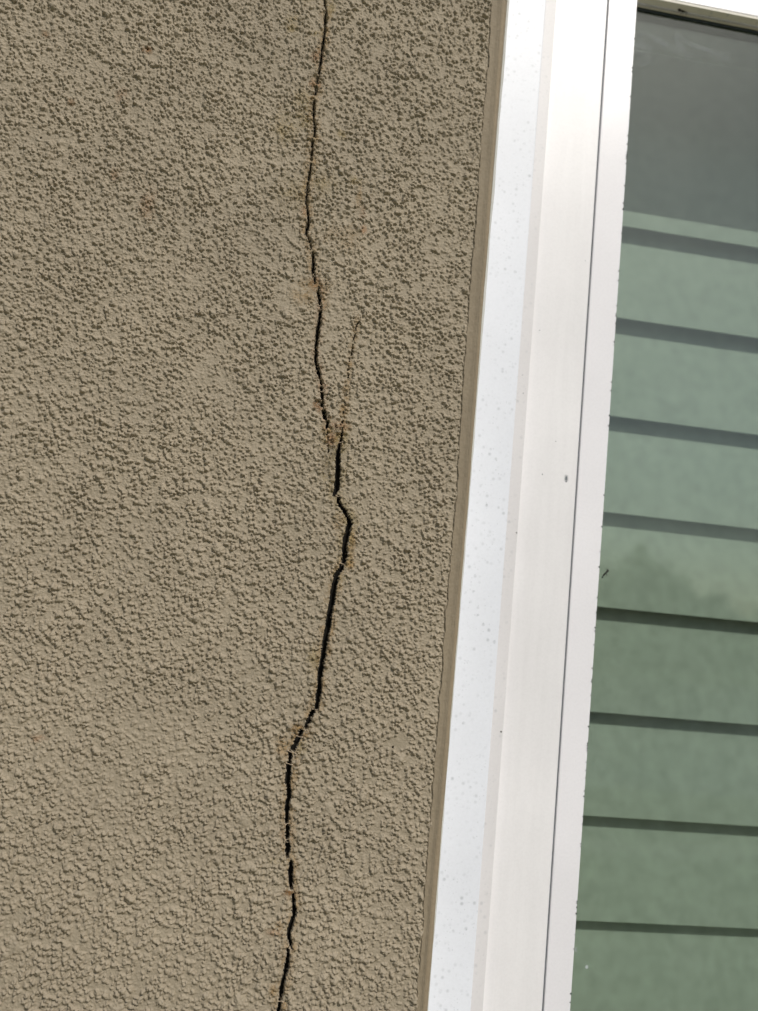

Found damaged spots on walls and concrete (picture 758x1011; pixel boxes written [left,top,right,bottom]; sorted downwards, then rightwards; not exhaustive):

crack [277,3,353,1011]